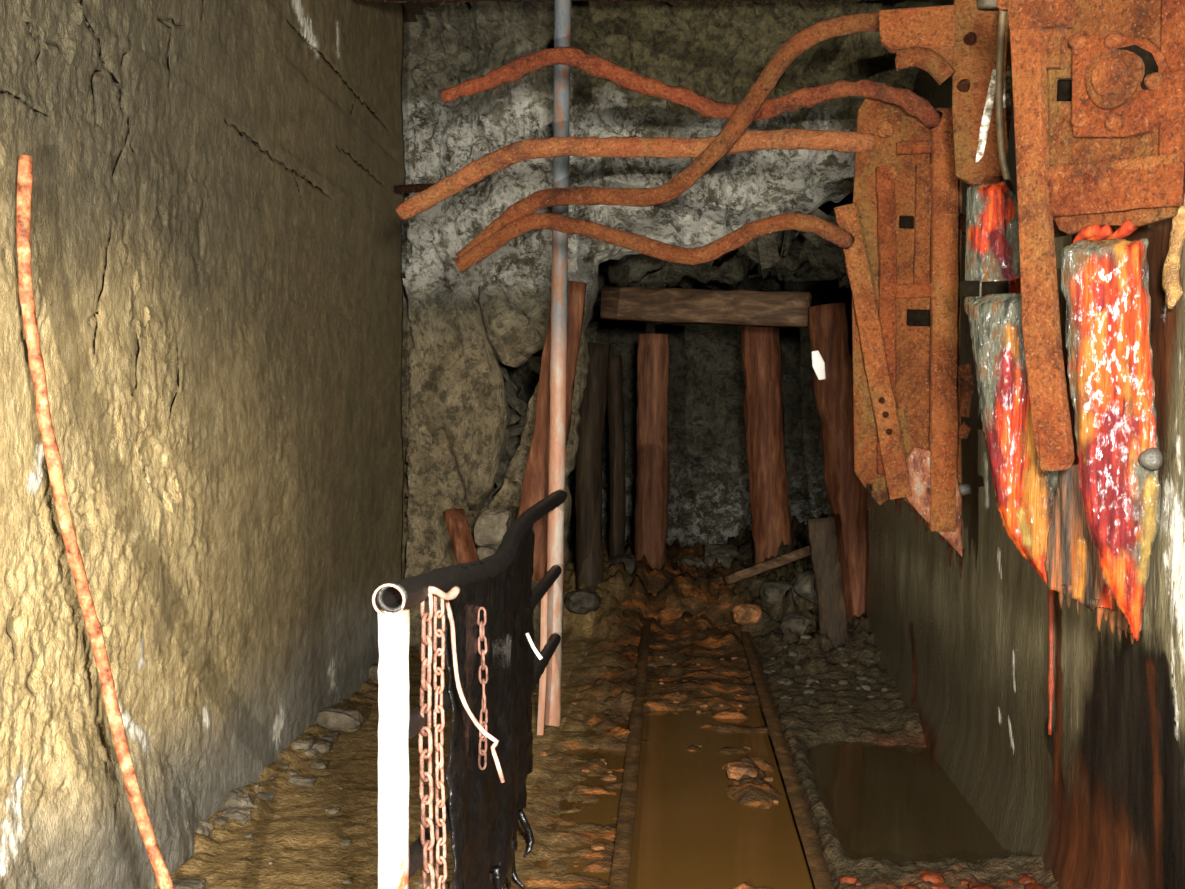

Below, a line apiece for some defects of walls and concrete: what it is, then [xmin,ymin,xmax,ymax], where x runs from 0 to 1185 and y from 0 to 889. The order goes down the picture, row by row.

crack [0,31,59,117]
crack [80,0,137,177]
crack [157,2,204,85]
crack [287,21,386,127]
crack [224,119,325,198]
crack [336,146,384,186]
rust [1061,296,1077,453]
rust [1128,217,1177,480]
leakage [1077,240,1185,889]
leakage [1045,718,1065,794]